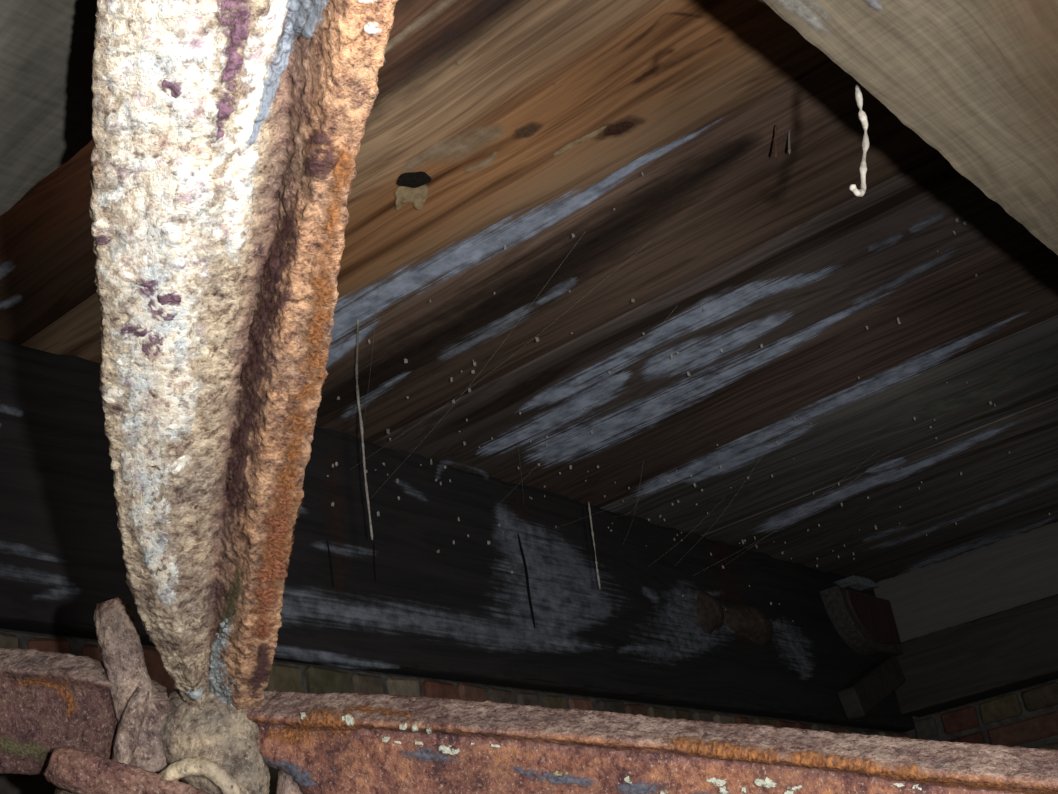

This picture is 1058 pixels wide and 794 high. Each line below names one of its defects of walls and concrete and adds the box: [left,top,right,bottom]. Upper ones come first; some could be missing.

water stain [317,120,751,417]
rust [219,129,353,698]
water stain [477,252,951,467]
water stain [635,313,1026,496]
water stain [751,421,1021,533]
water stain [864,478,1058,549]
water stain [274,646,392,668]
water stain [280,507,615,651]
water stain [621,588,734,657]
rust [269,706,412,744]
rust [666,736,1058,794]